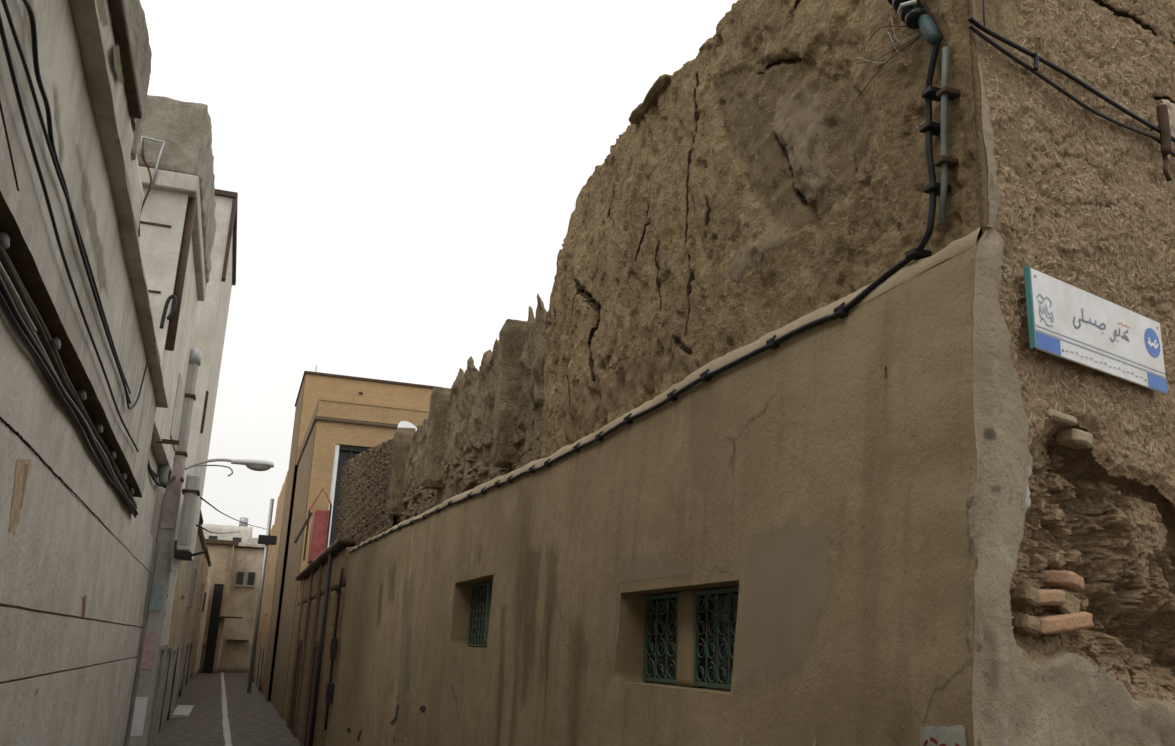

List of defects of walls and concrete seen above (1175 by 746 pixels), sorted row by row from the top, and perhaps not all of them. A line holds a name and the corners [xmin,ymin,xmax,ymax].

crack [635,73,711,352]
crack [757,56,802,74]
flaking render [714,66,867,228]
crack [774,135,816,205]
crack [1093,0,1175,45]
crack [1153,96,1175,104]
crack [567,281,628,419]
spalling [1009,409,1175,703]